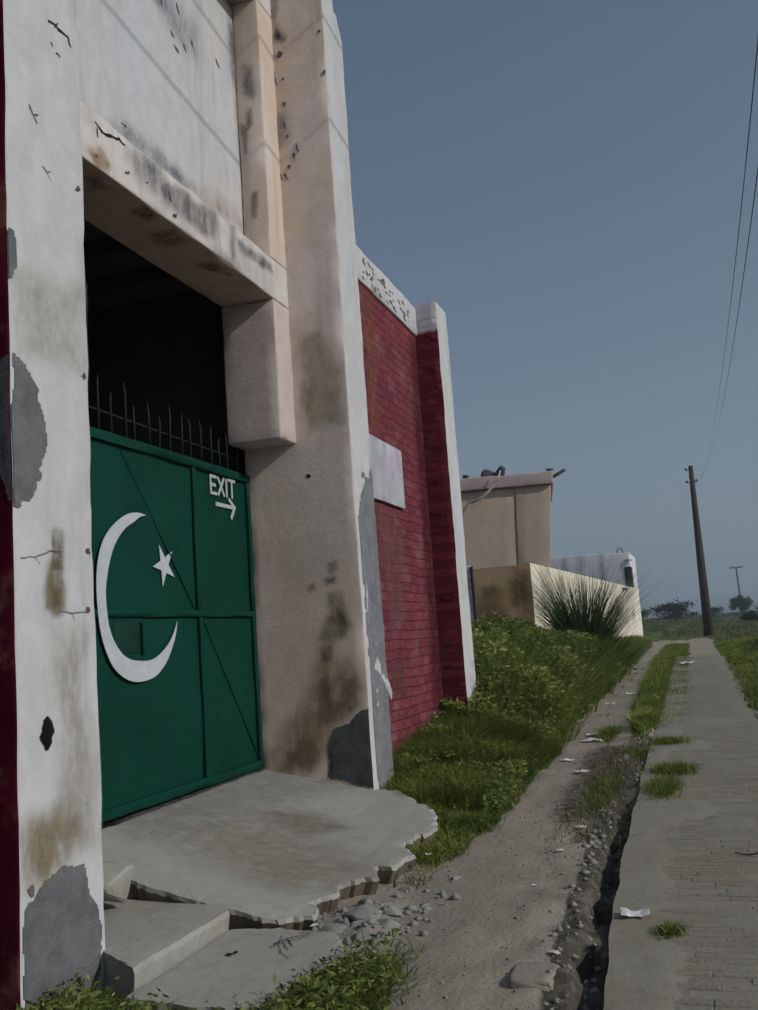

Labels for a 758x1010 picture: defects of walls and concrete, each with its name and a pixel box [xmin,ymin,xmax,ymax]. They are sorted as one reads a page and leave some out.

peeling [362,257,409,321]
spalling [0,353,47,508]
spalling [327,468,394,789]
damp [278,660,356,774]
spalling [23,863,102,1010]